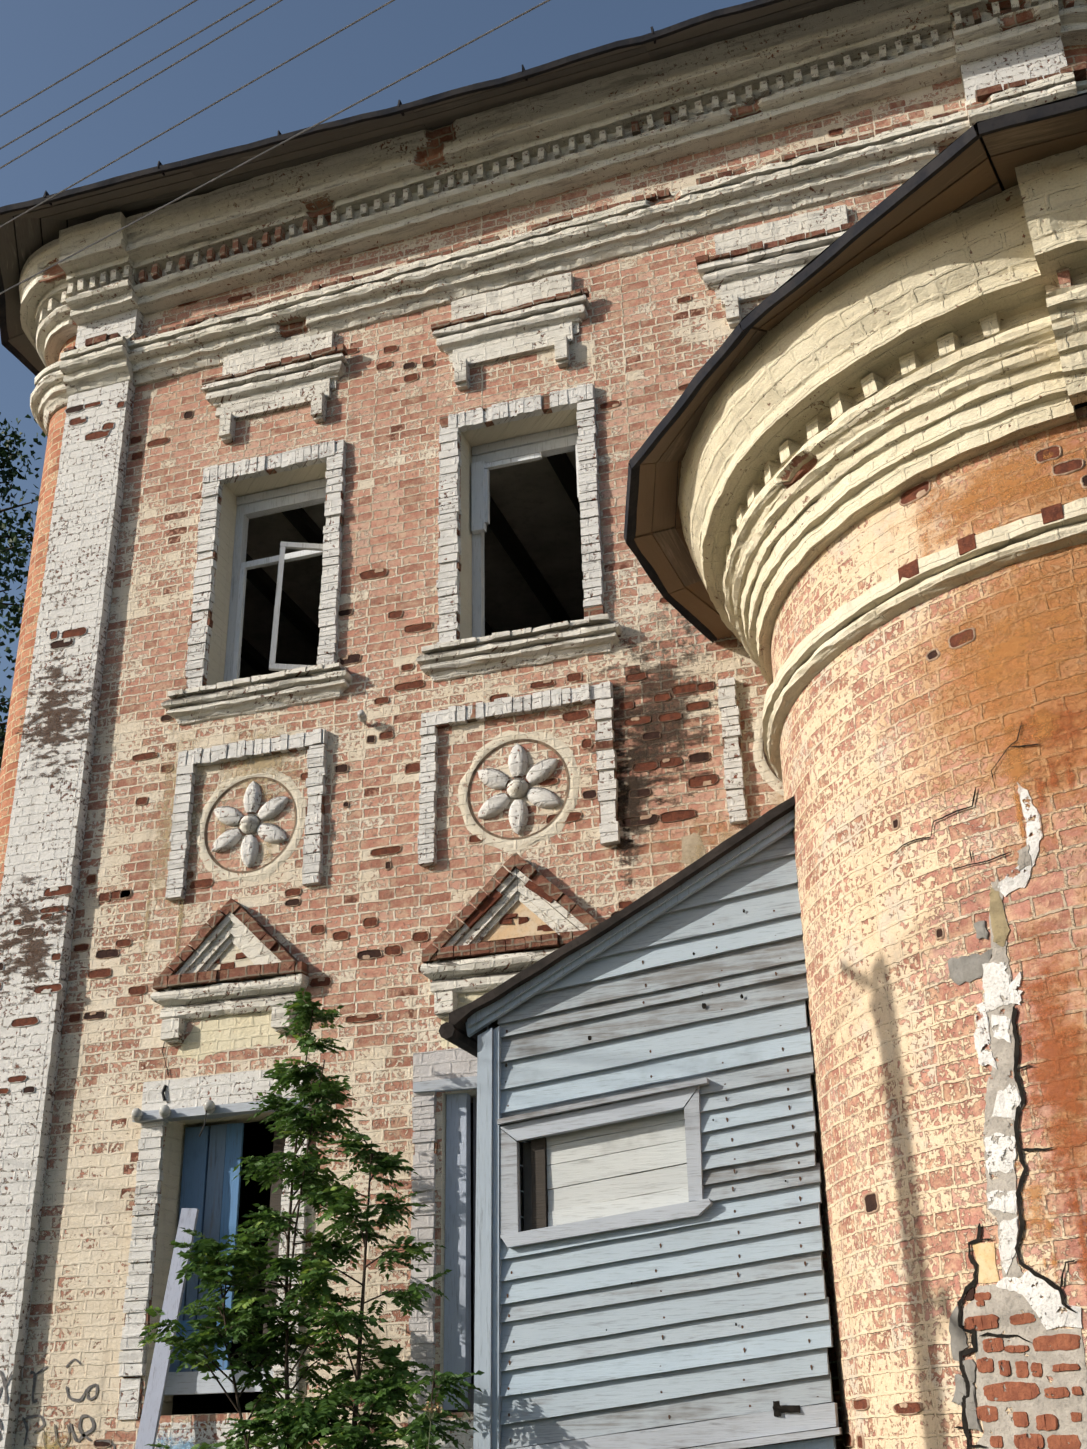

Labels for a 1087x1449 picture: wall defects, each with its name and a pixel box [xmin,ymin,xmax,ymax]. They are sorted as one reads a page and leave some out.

damp [16,654,95,784]
damp [616,750,640,884]
crack [895,722,1039,853]
crack [952,849,1013,870]
damp [0,875,67,1004]
spalling [935,926,945,940]
peeling [974,921,989,940]
peeling [973,962,1024,1069]
peeling [984,1084,1025,1174]
flaking render [952,1190,1087,1449]
spalling [892,1401,924,1416]